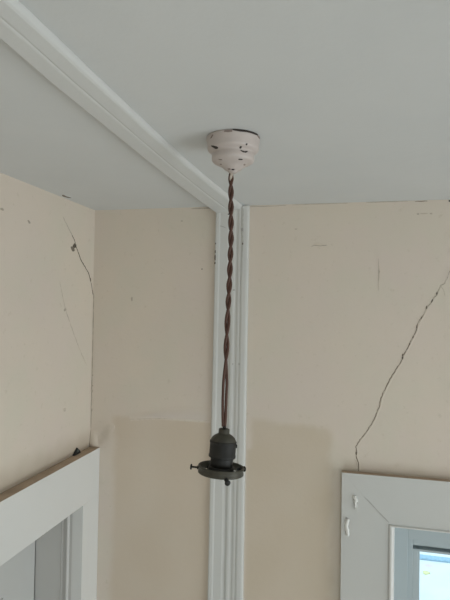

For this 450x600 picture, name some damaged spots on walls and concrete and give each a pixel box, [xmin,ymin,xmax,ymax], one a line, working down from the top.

crack [64,219,94,328]
crack [355,271,450,471]